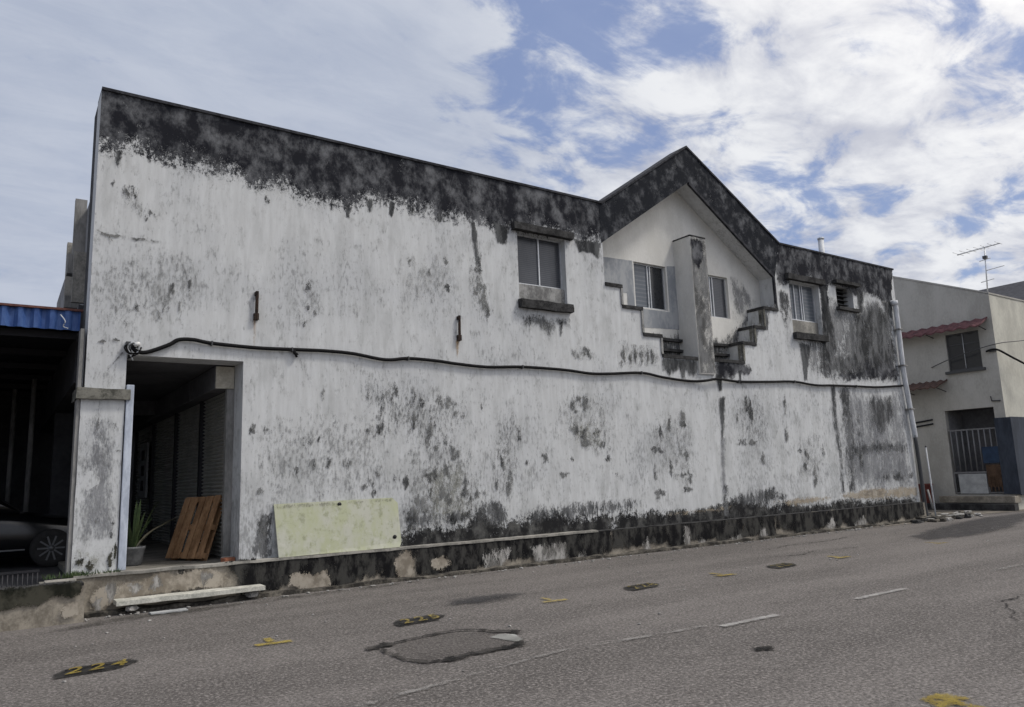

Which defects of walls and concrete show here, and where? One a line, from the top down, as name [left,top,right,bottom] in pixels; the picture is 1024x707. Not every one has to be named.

water stain [98,90,925,595]